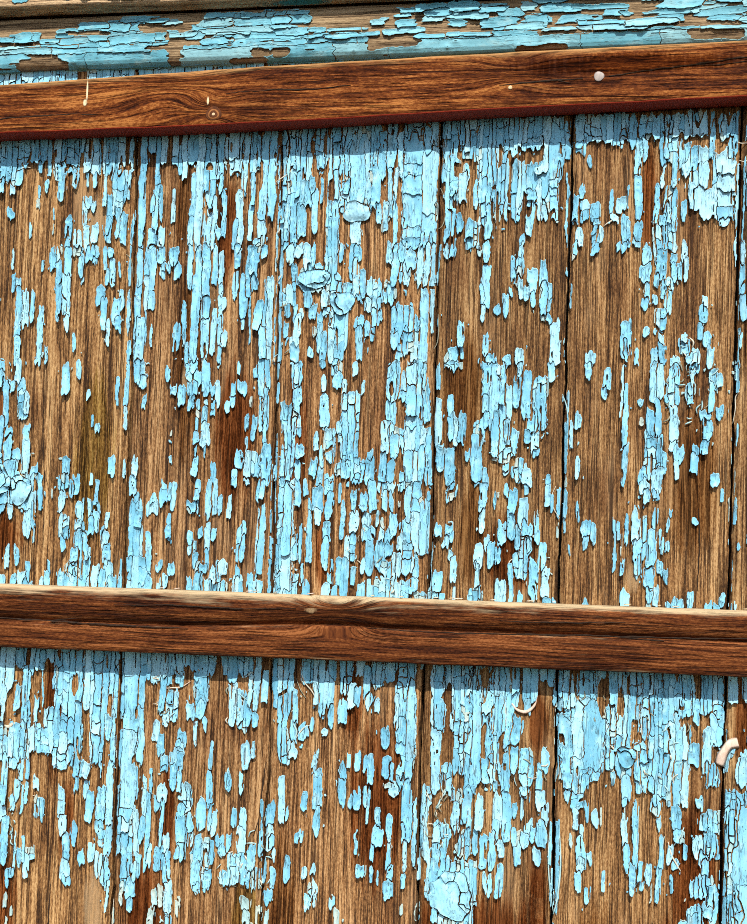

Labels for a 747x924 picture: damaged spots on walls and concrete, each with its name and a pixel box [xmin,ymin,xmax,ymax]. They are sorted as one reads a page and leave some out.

peeling [0,0,747,85]
peeling [0,647,747,924]